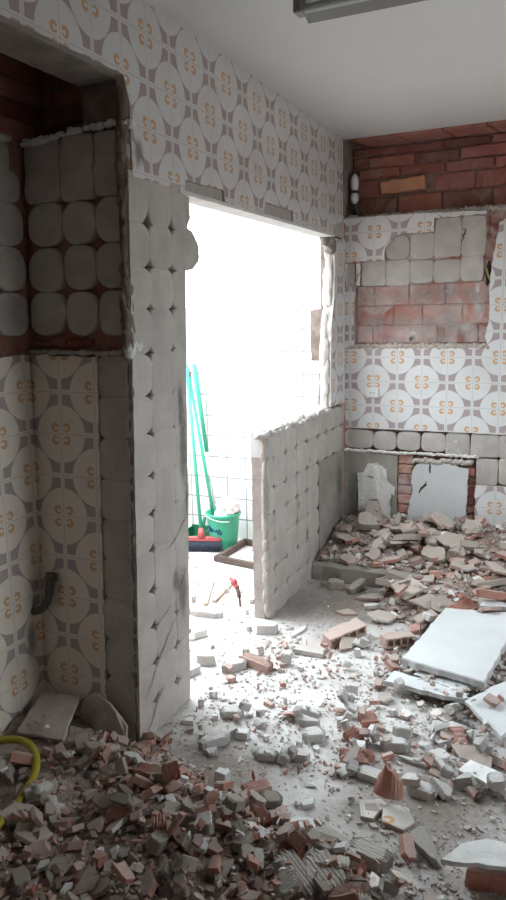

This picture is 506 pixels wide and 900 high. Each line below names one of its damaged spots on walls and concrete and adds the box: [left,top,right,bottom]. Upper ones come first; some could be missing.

peeling [0,54,223,742]
flaking render [254,120,506,619]